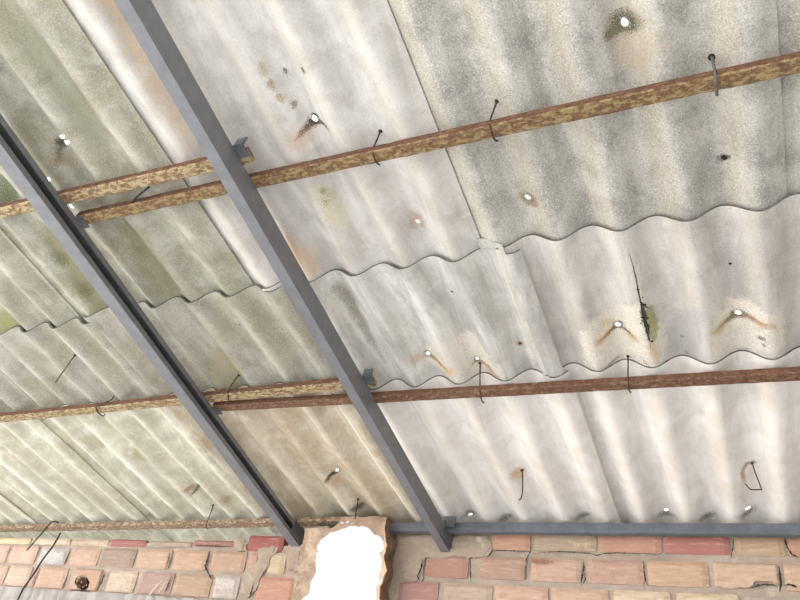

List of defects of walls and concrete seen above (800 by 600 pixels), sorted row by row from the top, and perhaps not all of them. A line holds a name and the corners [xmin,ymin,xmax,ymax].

rust [282,113,329,156]
rust [412,329,506,383]
rust [576,301,668,370]
crack [629,247,662,367]
rust [707,294,790,363]
peeling [302,521,388,600]